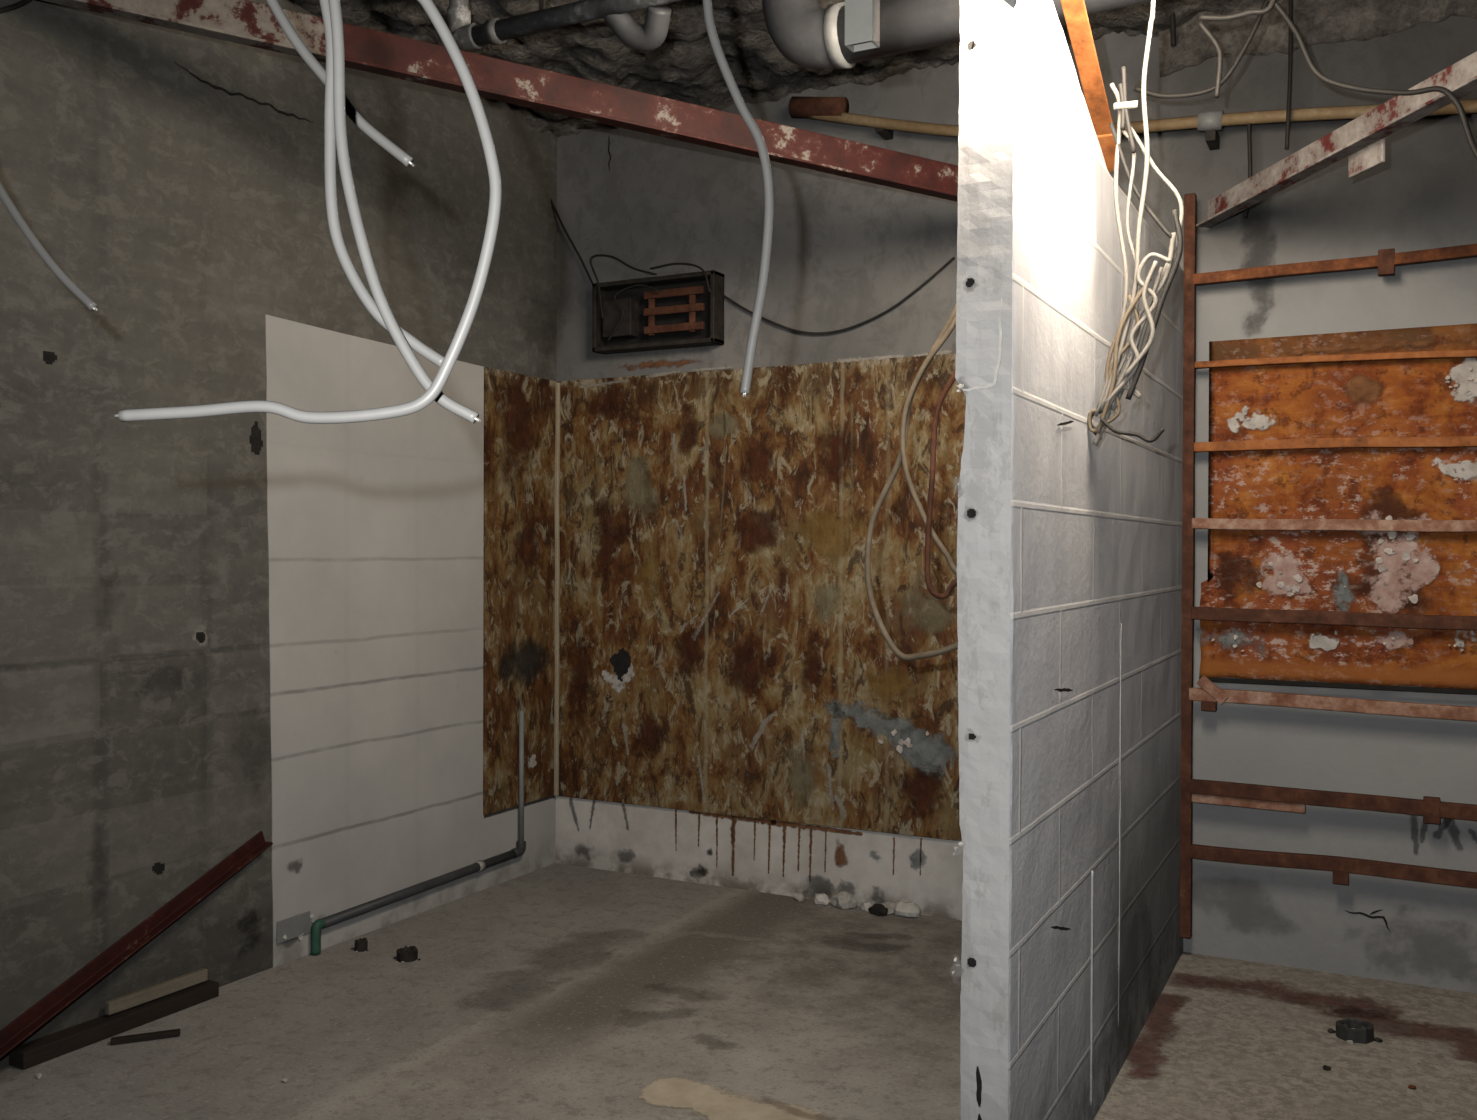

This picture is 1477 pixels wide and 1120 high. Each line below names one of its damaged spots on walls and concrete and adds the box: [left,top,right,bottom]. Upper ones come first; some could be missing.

corrosion [627,360,691,370]
corrosion [500,390,534,476]
corrosion [679,406,699,452]
corrosion [739,439,773,480]
corrosion [598,500,624,575]
corrosion [738,511,778,552]
corrosion [1333,491,1420,594]
corrosion [1216,552,1261,592]
corrosion [1398,568,1427,614]
corrosion [676,630,702,673]
corrosion [726,648,771,692]
corrosion [675,809,862,881]